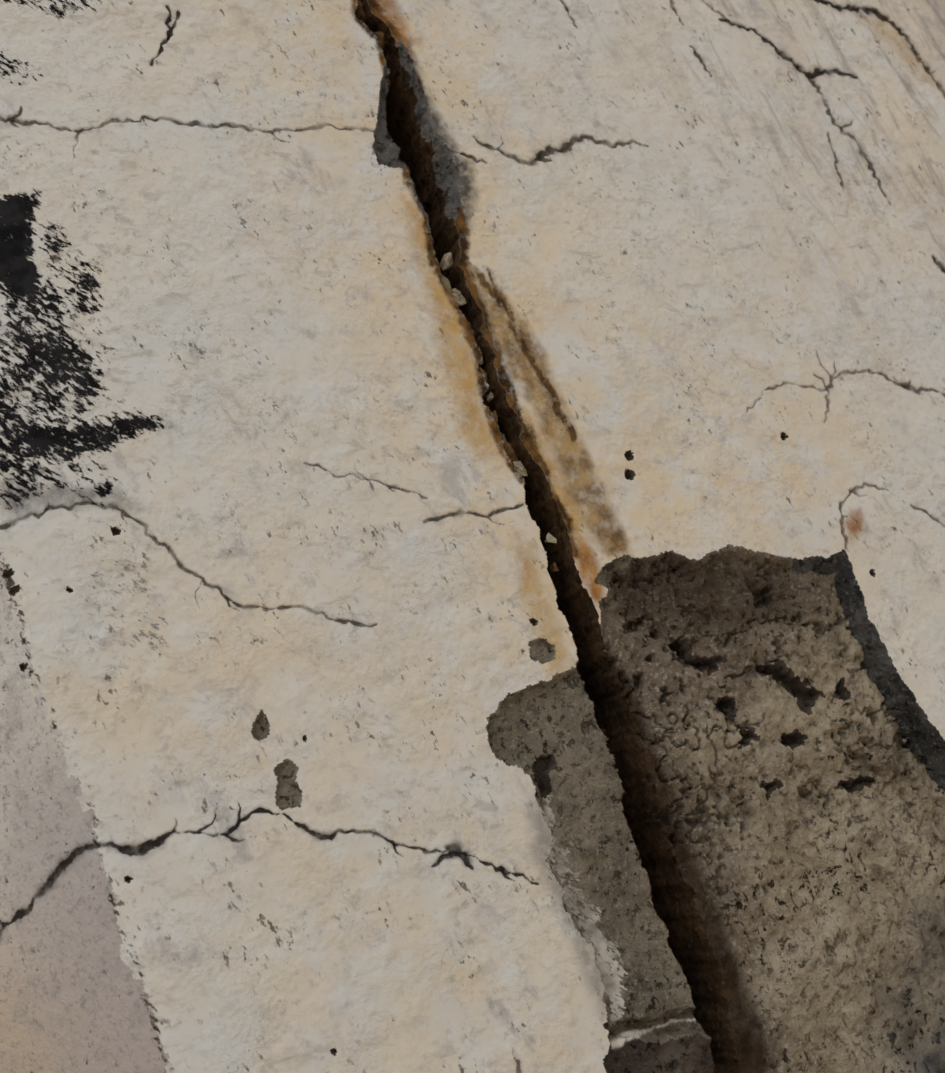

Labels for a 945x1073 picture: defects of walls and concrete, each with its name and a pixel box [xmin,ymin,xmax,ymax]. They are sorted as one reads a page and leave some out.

crack [1,106,351,158]
crack [711,9,891,205]
crack [814,0,945,96]
corrosion [411,207,490,452]
crack [0,501,292,611]
crack [304,0,739,1070]
corrosion [523,426,602,600]
flaking render [251,709,270,741]
crack [0,802,539,930]
flaking render [273,758,303,810]
flaking render [485,618,718,1073]
flaking render [594,544,945,1073]